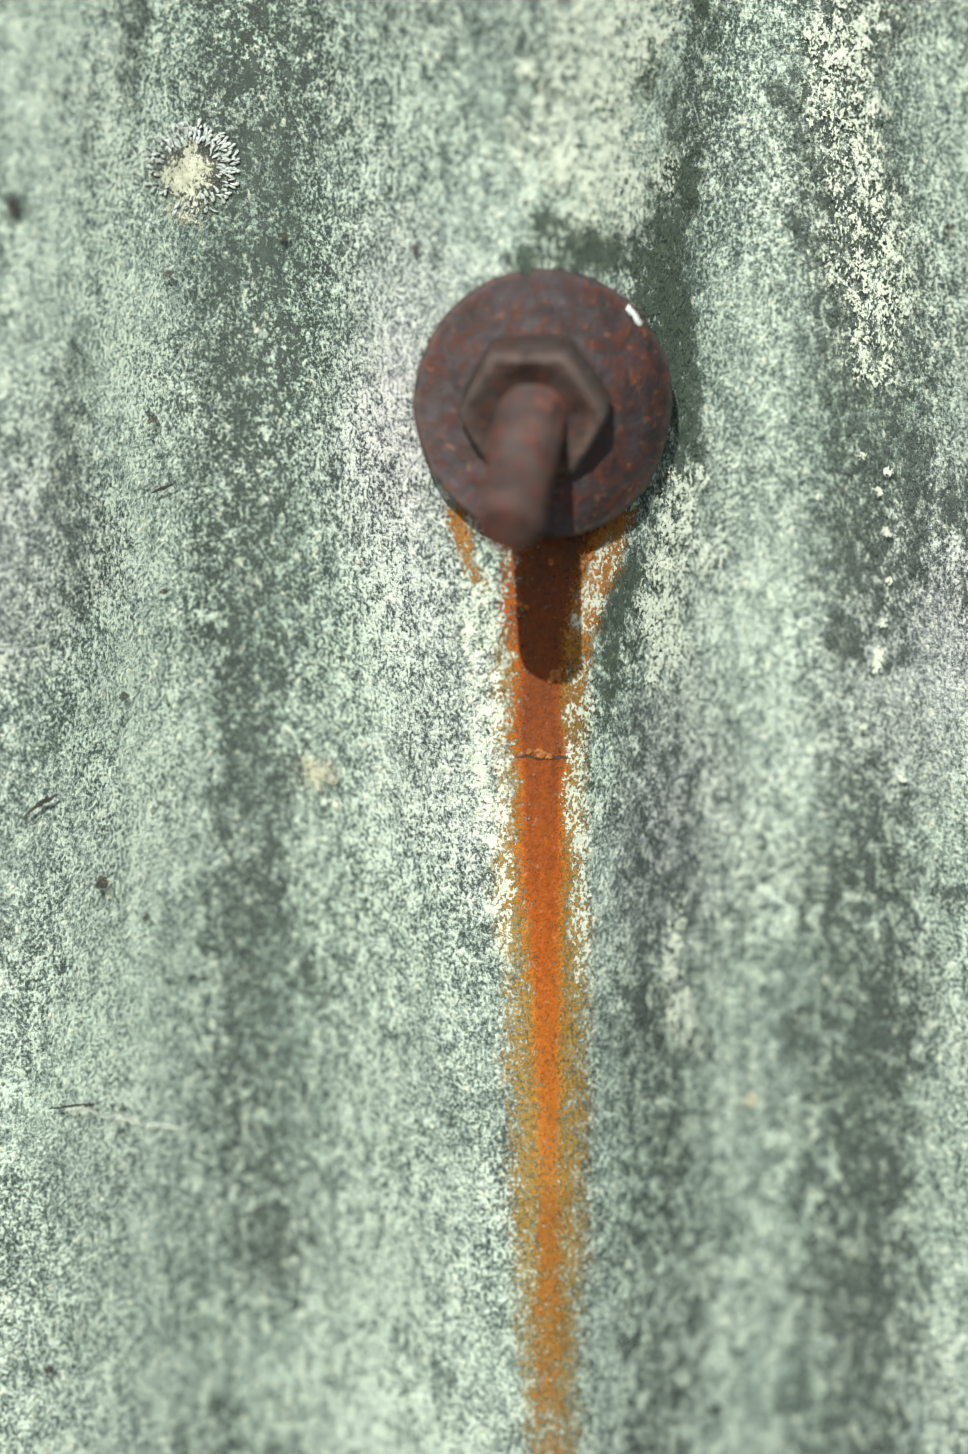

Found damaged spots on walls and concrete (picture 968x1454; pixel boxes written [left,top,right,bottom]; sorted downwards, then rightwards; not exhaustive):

rust [442,499,651,1454]